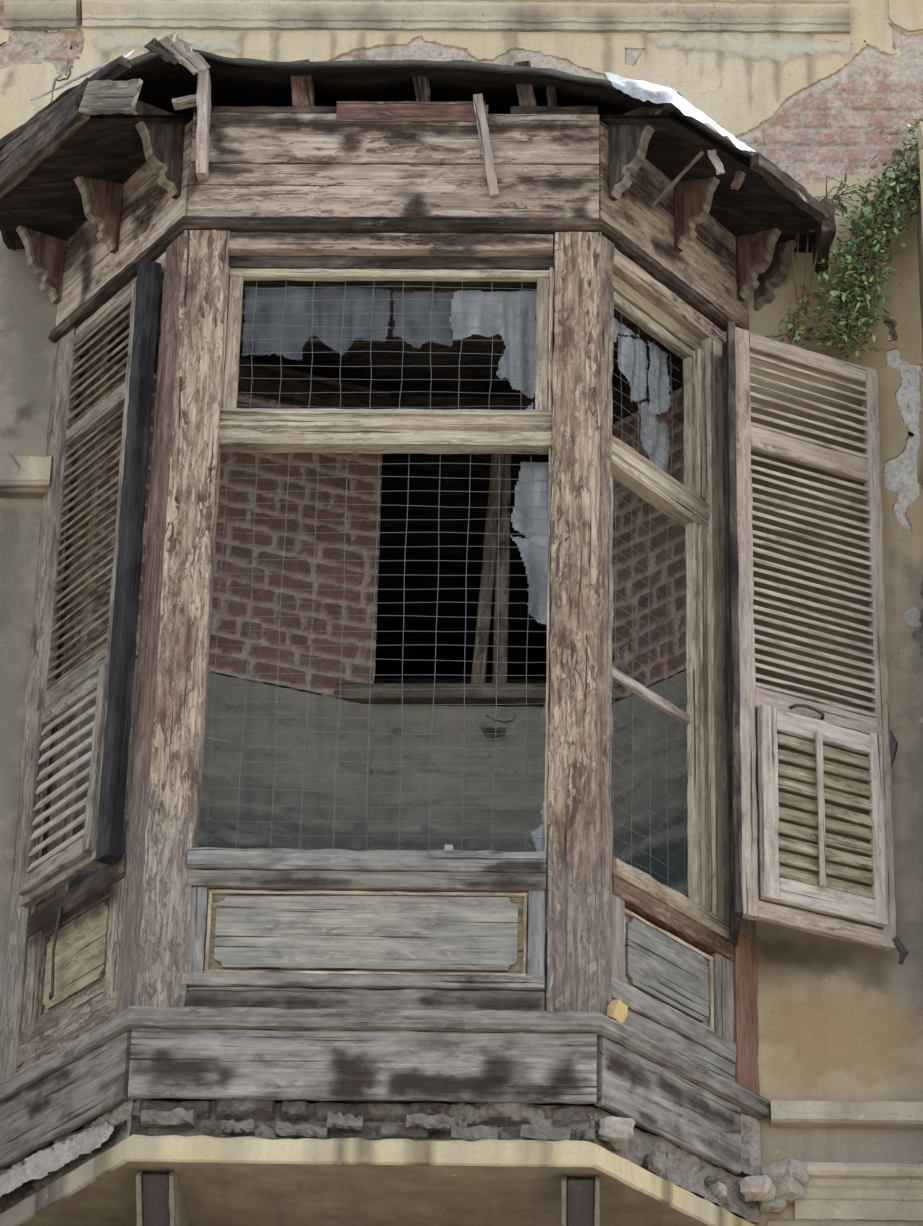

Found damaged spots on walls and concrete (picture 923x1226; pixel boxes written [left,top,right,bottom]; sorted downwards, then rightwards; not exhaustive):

spalling [0,0,84,83]
water stain [95,32,240,52]
spalling [334,36,610,81]
spalling [625,49,647,82]
spalling [727,26,923,186]
spalling [883,316,922,530]
flaking render [904,584,923,657]
spalling [0,1099,810,1223]